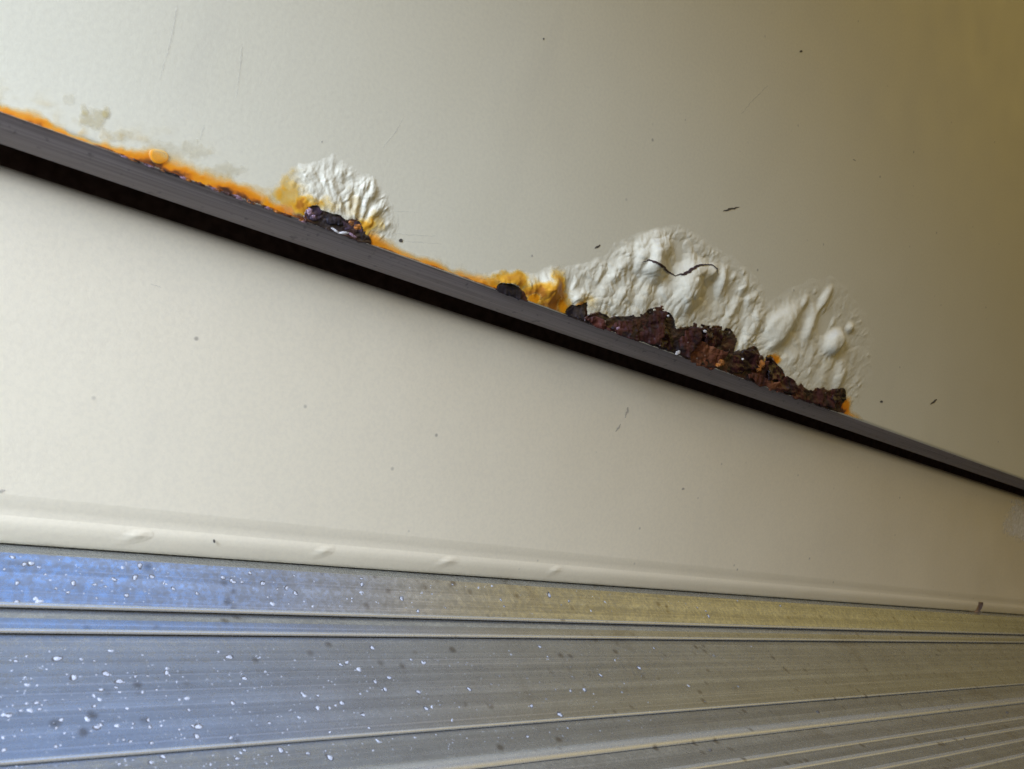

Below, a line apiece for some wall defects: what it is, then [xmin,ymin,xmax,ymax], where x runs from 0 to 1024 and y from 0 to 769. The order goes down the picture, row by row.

rust [0,107,853,417]
crack [643,259,718,276]